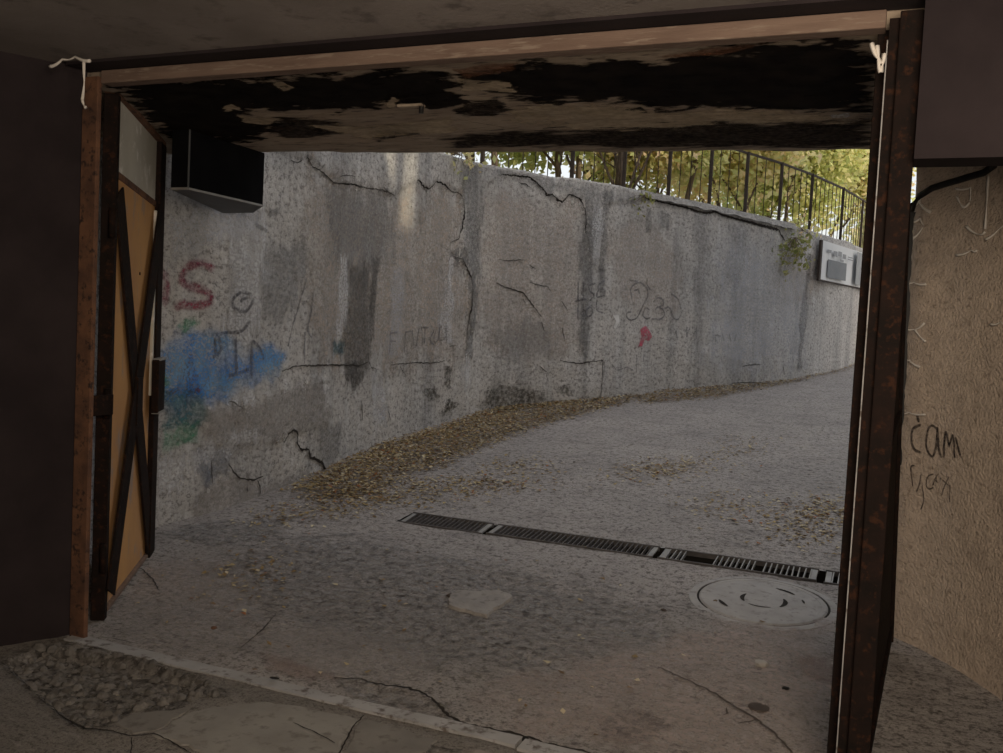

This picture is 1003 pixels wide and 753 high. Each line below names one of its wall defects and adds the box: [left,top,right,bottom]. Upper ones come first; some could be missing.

peeling [456,79,517,93]
peeling [223,104,280,125]
peeling [507,104,858,132]
crack [291,157,394,195]
crack [501,174,587,233]
water stain [330,192,384,386]
crack [282,180,473,375]
crack [497,259,603,393]
crack [284,429,326,470]
spalling [0,640,227,728]
crack [293,715,364,753]